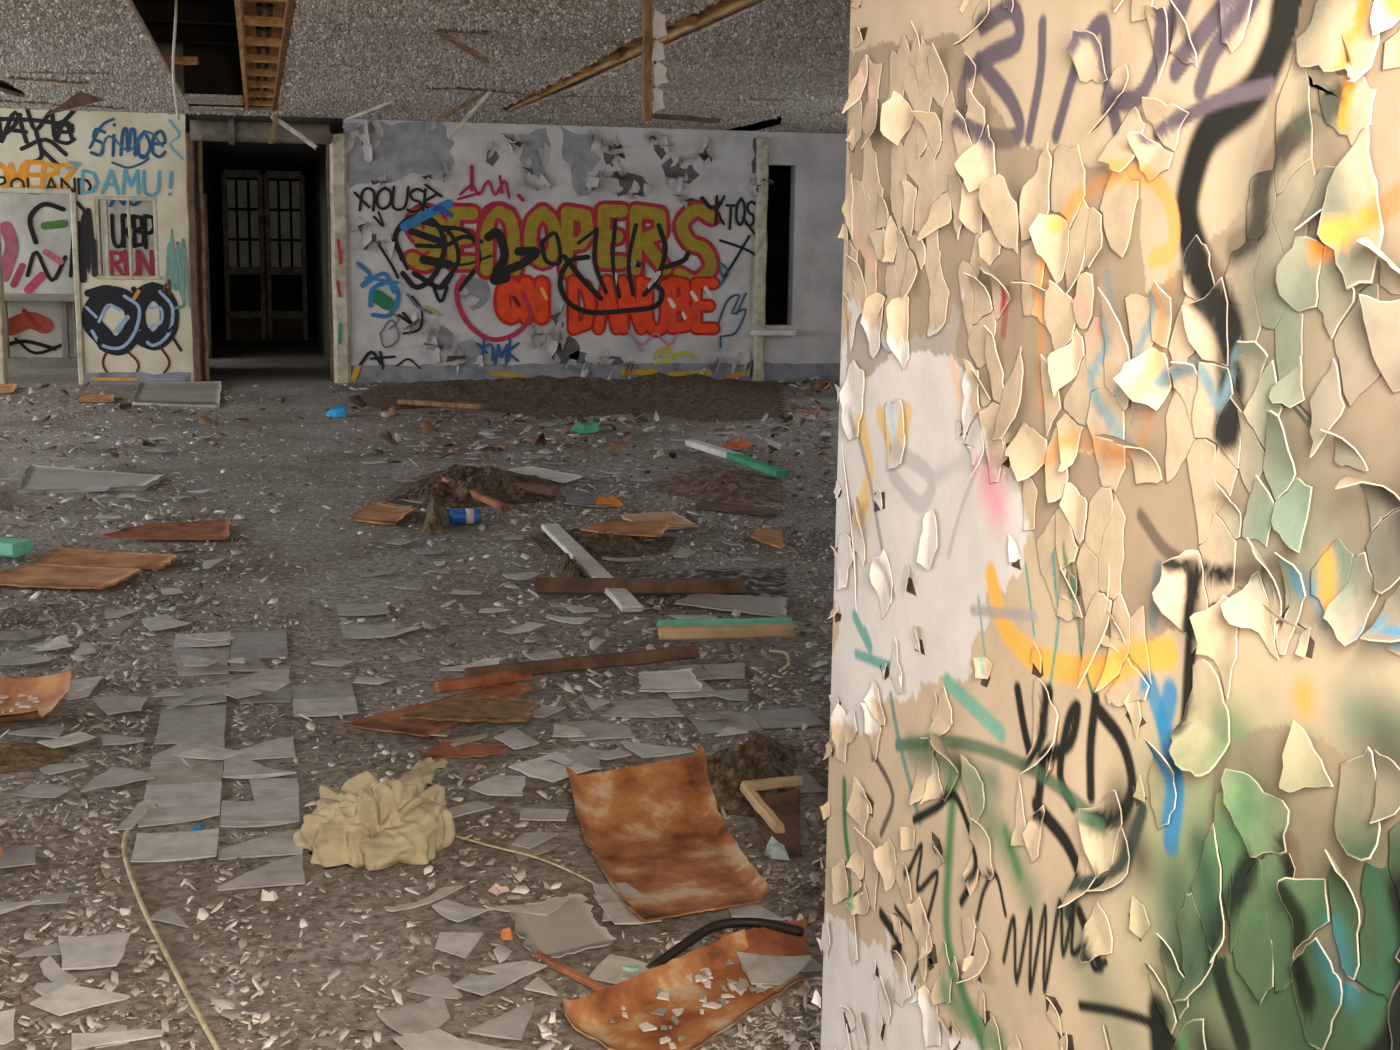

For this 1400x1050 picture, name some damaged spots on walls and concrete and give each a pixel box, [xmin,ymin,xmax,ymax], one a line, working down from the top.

peeling [342,119,455,195]
peeling [486,126,650,200]
peeling [646,130,714,208]
peeling [748,139,774,197]
peeling [816,0,1400,1050]
peeling [811,990,821,1008]